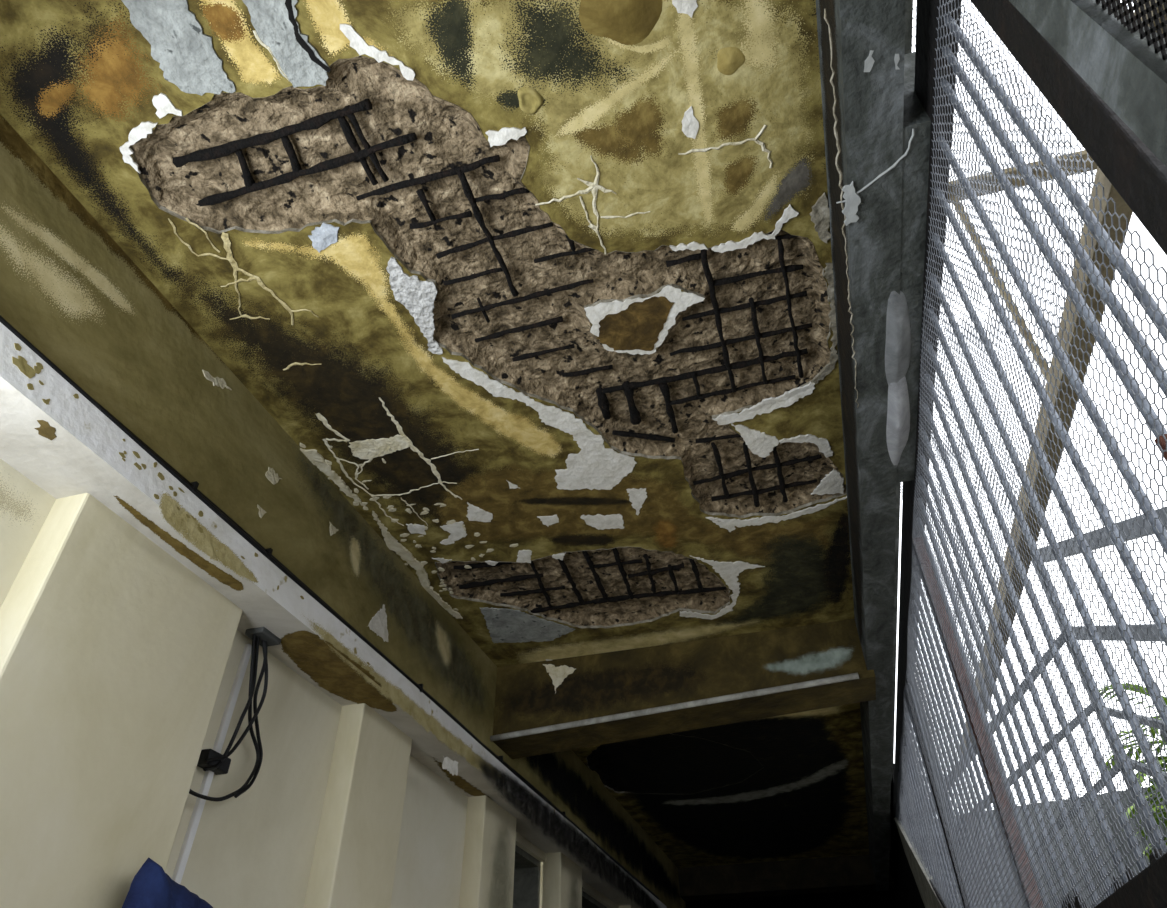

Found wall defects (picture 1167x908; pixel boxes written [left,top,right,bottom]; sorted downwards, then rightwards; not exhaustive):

crack [168,218,319,325]
spalling [119,0,859,533]
crack [535,155,650,254]
peeling [12,343,50,405]
peeling [34,420,57,441]
crack [316,397,479,526]
water stain [0,0,863,728]
spalling [300,443,765,643]
water stain [280,614,854,908]